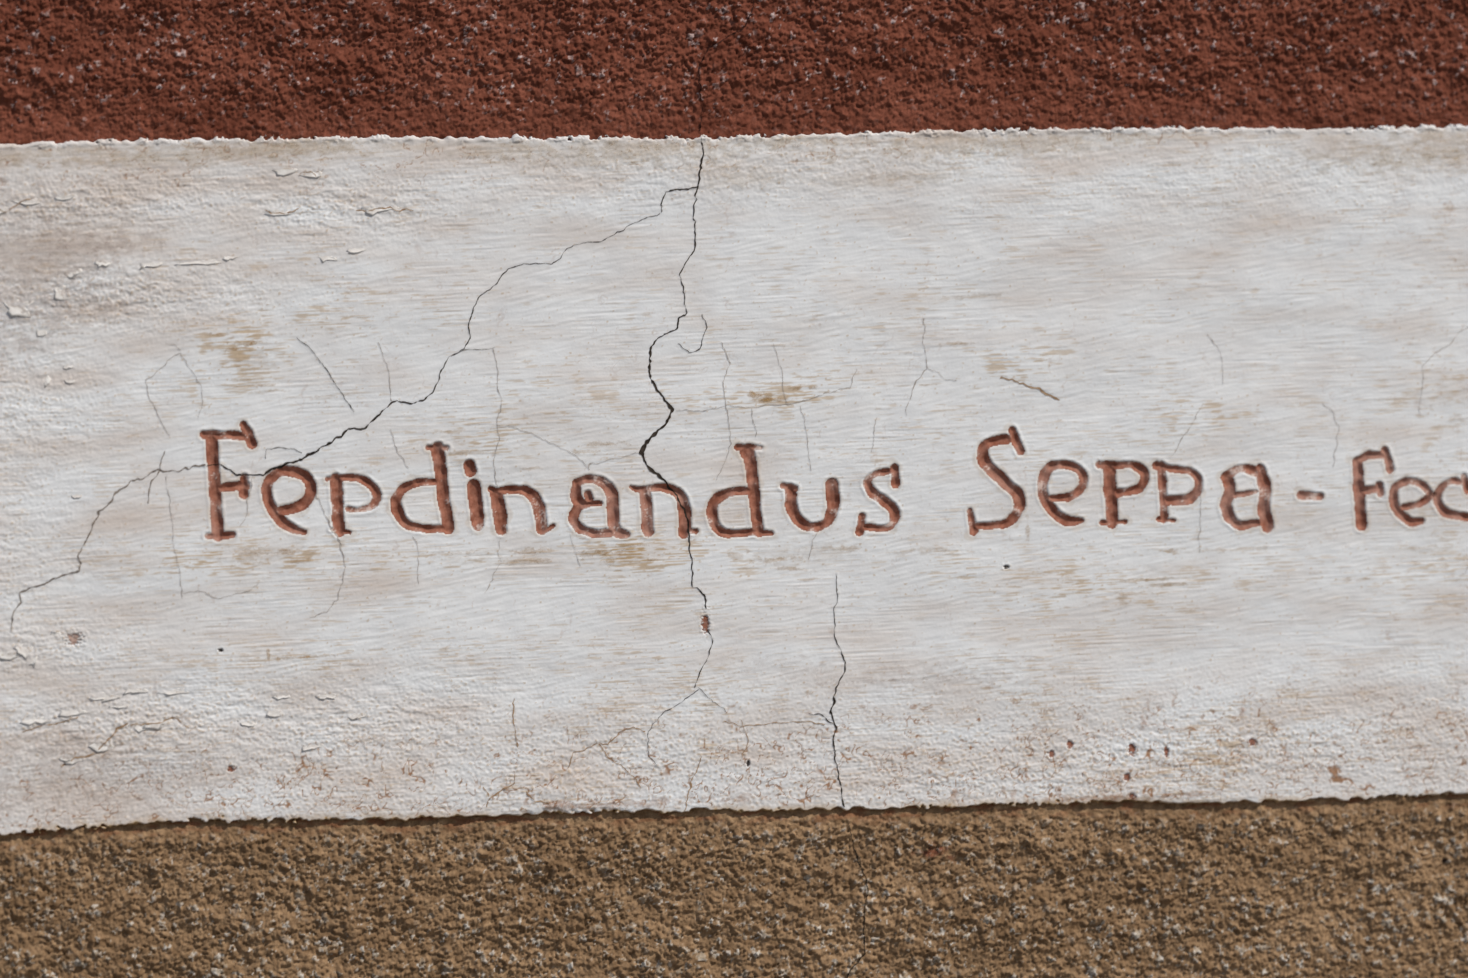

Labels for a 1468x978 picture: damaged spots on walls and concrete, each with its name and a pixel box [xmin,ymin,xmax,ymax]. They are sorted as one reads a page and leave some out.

crack [10,0,869,978]
crack [871,319,957,452]